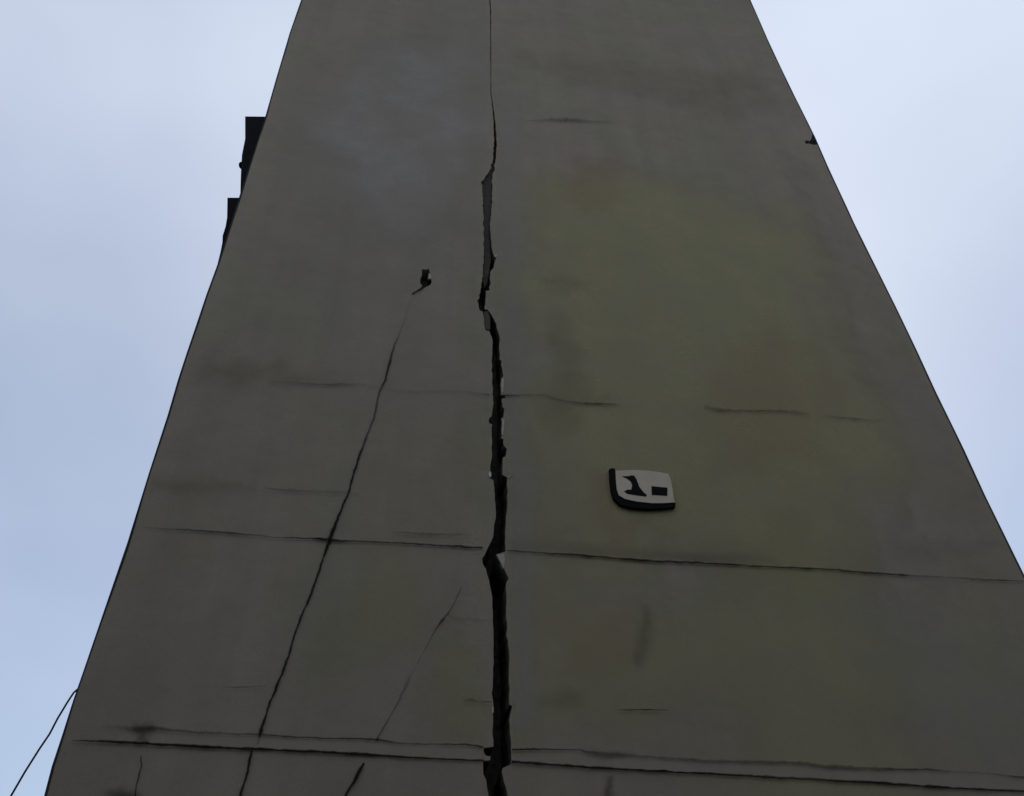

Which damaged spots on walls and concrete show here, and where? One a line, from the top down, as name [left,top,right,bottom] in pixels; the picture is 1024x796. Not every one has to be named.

crack [76,0,515,796]